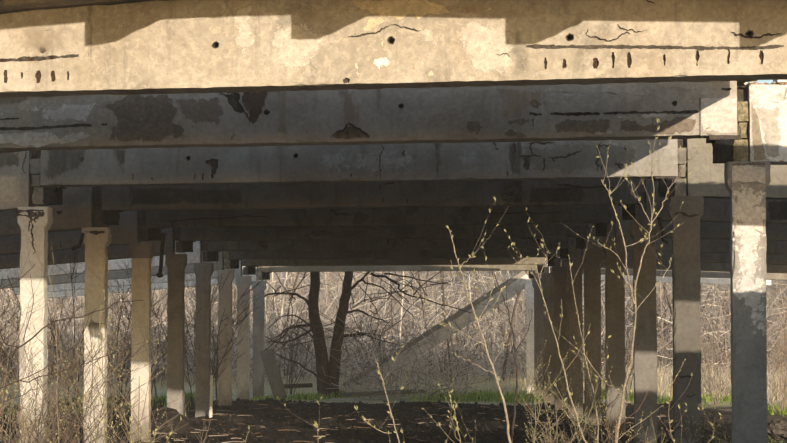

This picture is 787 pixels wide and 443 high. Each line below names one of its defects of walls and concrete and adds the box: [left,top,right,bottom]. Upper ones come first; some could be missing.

crack [348,24,420,37]
peeling [351,0,450,31]
crack [586,24,645,41]
crack [731,31,781,39]
peeling [0,92,267,148]
crack [493,141,624,190]
crack [28,217,36,254]
peeling [732,106,783,345]